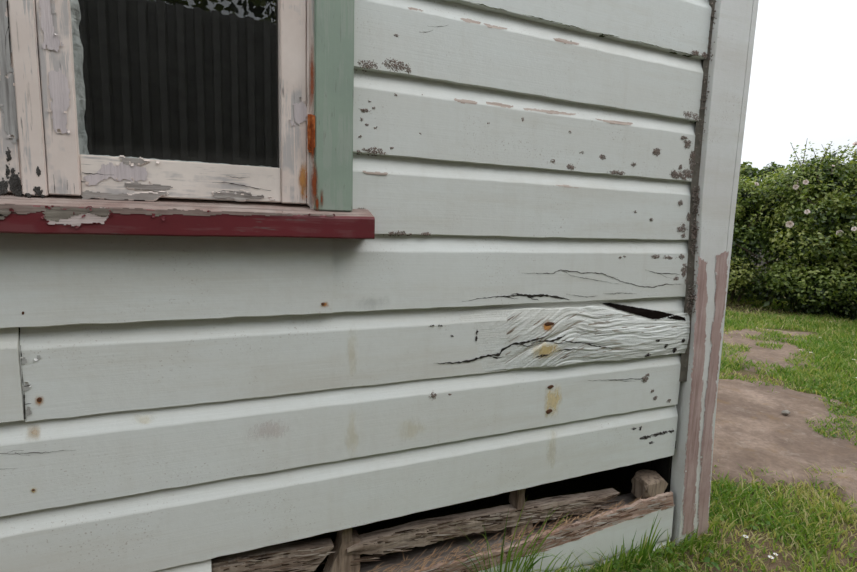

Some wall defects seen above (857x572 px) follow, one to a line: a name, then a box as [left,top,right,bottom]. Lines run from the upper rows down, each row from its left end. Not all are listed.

peeling [39,0,64,52]
peeling [0,0,19,144]
peeling [454,98,575,115]
peeling [0,155,335,229]
corrosion [299,125,323,209]
crack [463,270,680,302]
crack [438,335,612,364]
corrosion [546,385,559,414]
peeling [682,251,729,536]
crack [0,450,74,469]